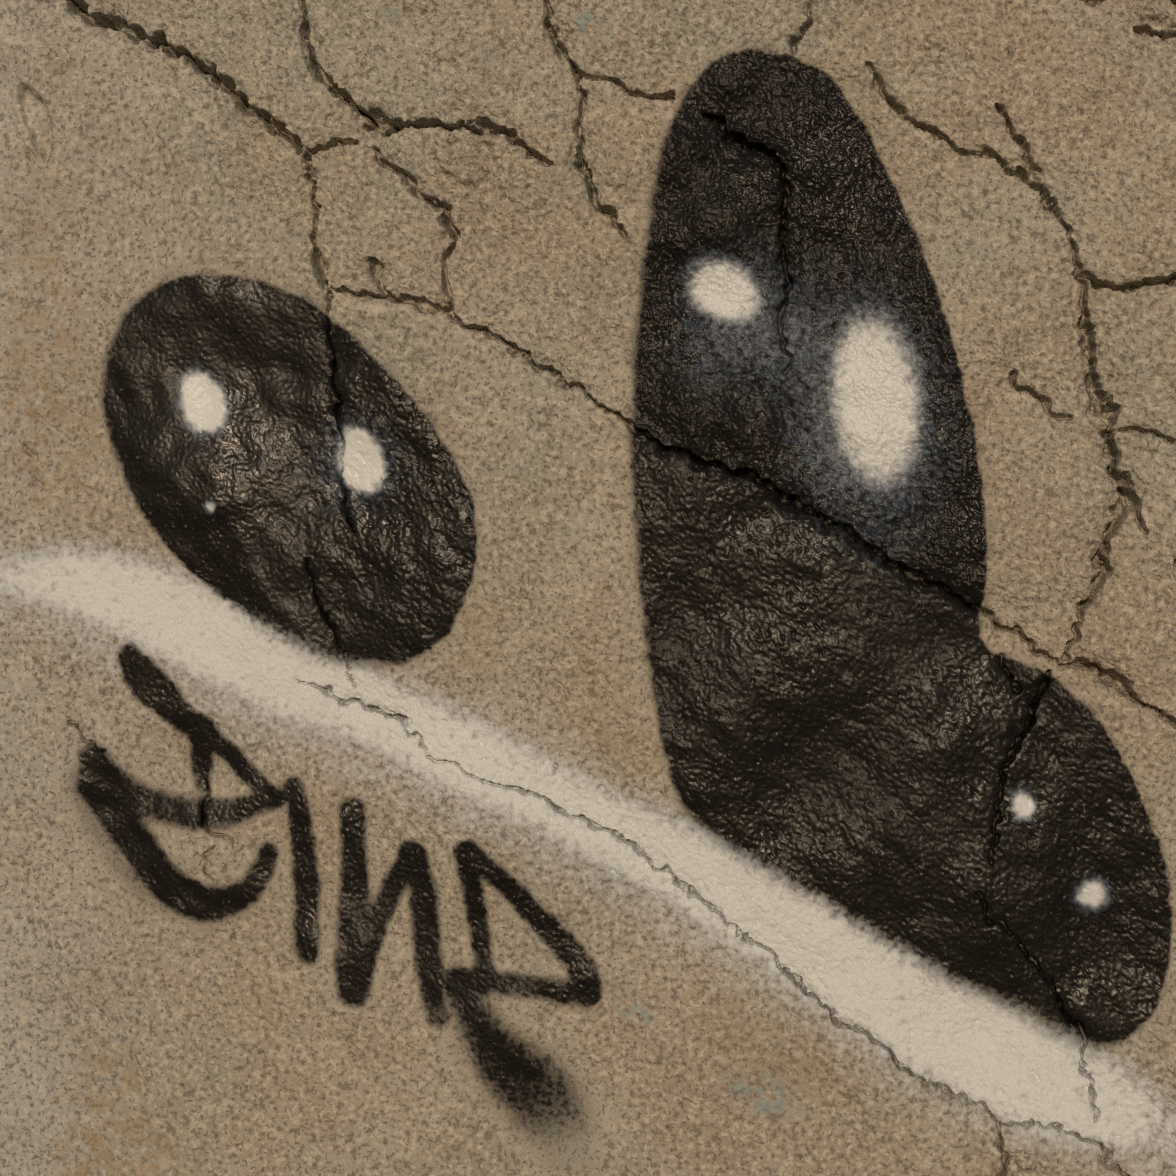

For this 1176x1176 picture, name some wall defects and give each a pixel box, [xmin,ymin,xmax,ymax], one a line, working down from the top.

crack [60,0,1176,867]
crack [200,781,235,884]
crack [292,558,1130,1176]